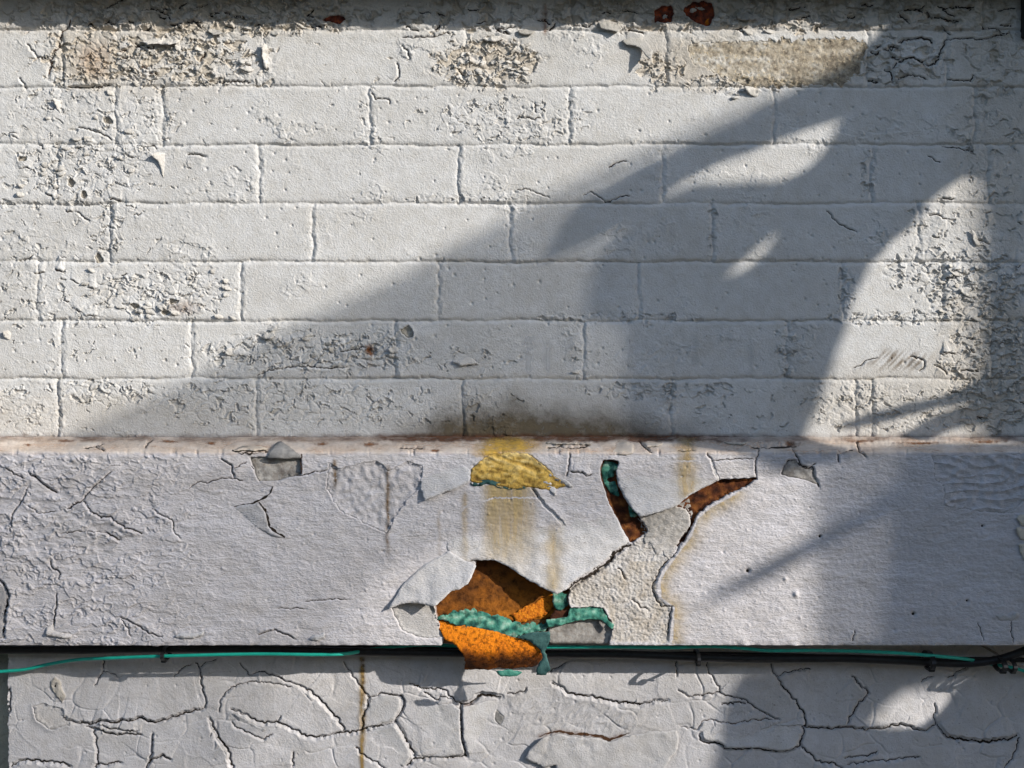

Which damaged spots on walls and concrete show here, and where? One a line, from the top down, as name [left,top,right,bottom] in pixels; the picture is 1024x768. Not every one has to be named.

peeling [116,5,335,87]
peeling [454,42,530,82]
crack [868,5,1015,84]
peeling [936,264,1016,315]
crack [5,444,181,540]
crack [189,459,254,489]
peeling [232,441,303,538]
corrosion [487,485,527,541]
peeling [326,440,757,677]
crack [0,580,10,638]
crack [12,659,526,768]
crack [550,662,1020,768]